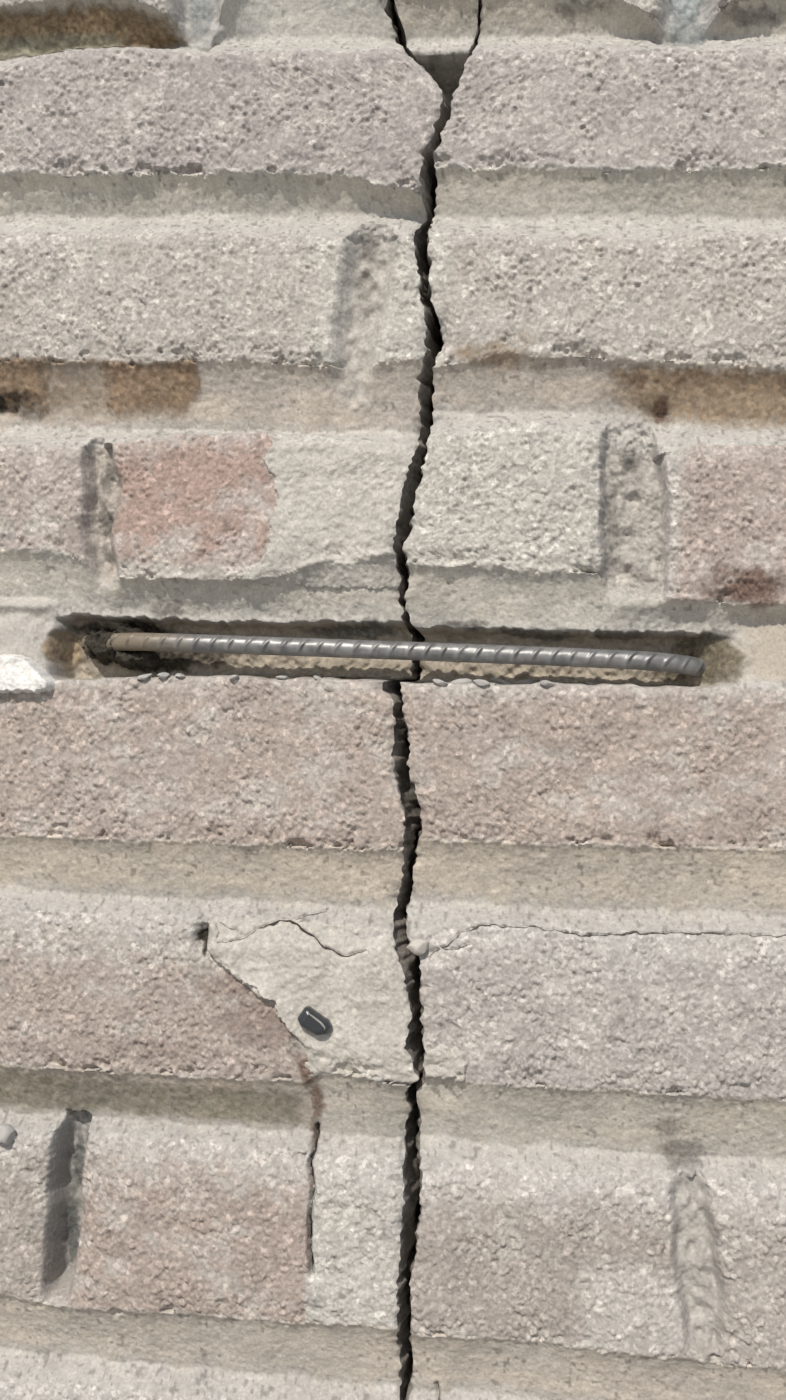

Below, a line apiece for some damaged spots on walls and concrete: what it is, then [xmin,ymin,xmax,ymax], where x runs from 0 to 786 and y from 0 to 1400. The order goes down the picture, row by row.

crack [384,0,417,62]
crack [468,0,483,58]
crack [217,91,786,1400]